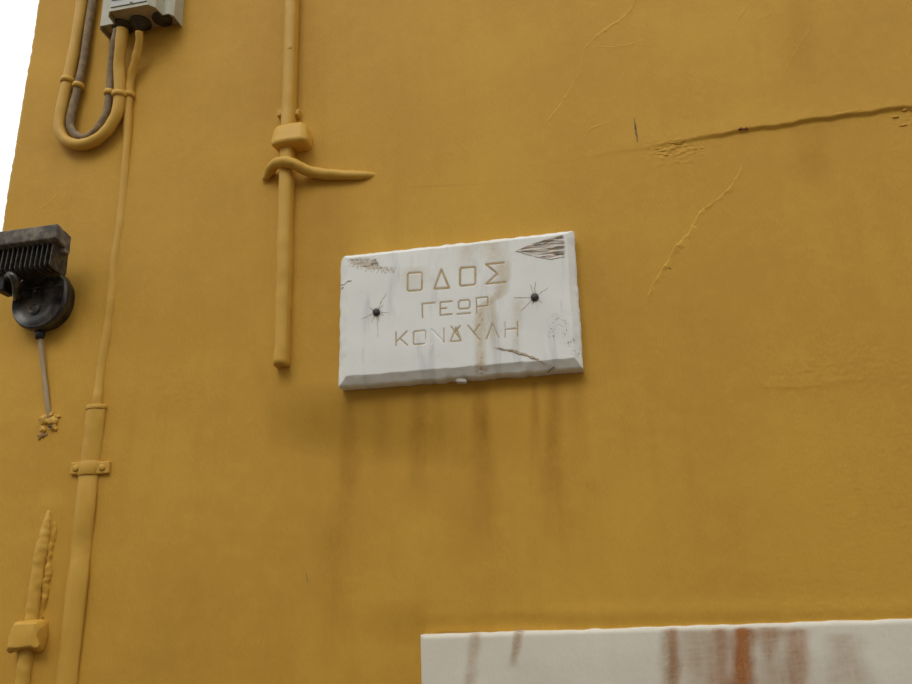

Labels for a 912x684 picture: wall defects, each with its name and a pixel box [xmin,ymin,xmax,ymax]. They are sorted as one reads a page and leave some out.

spalling [516,235,565,260]
crack [645,163,745,302]
rust [735,629,754,684]